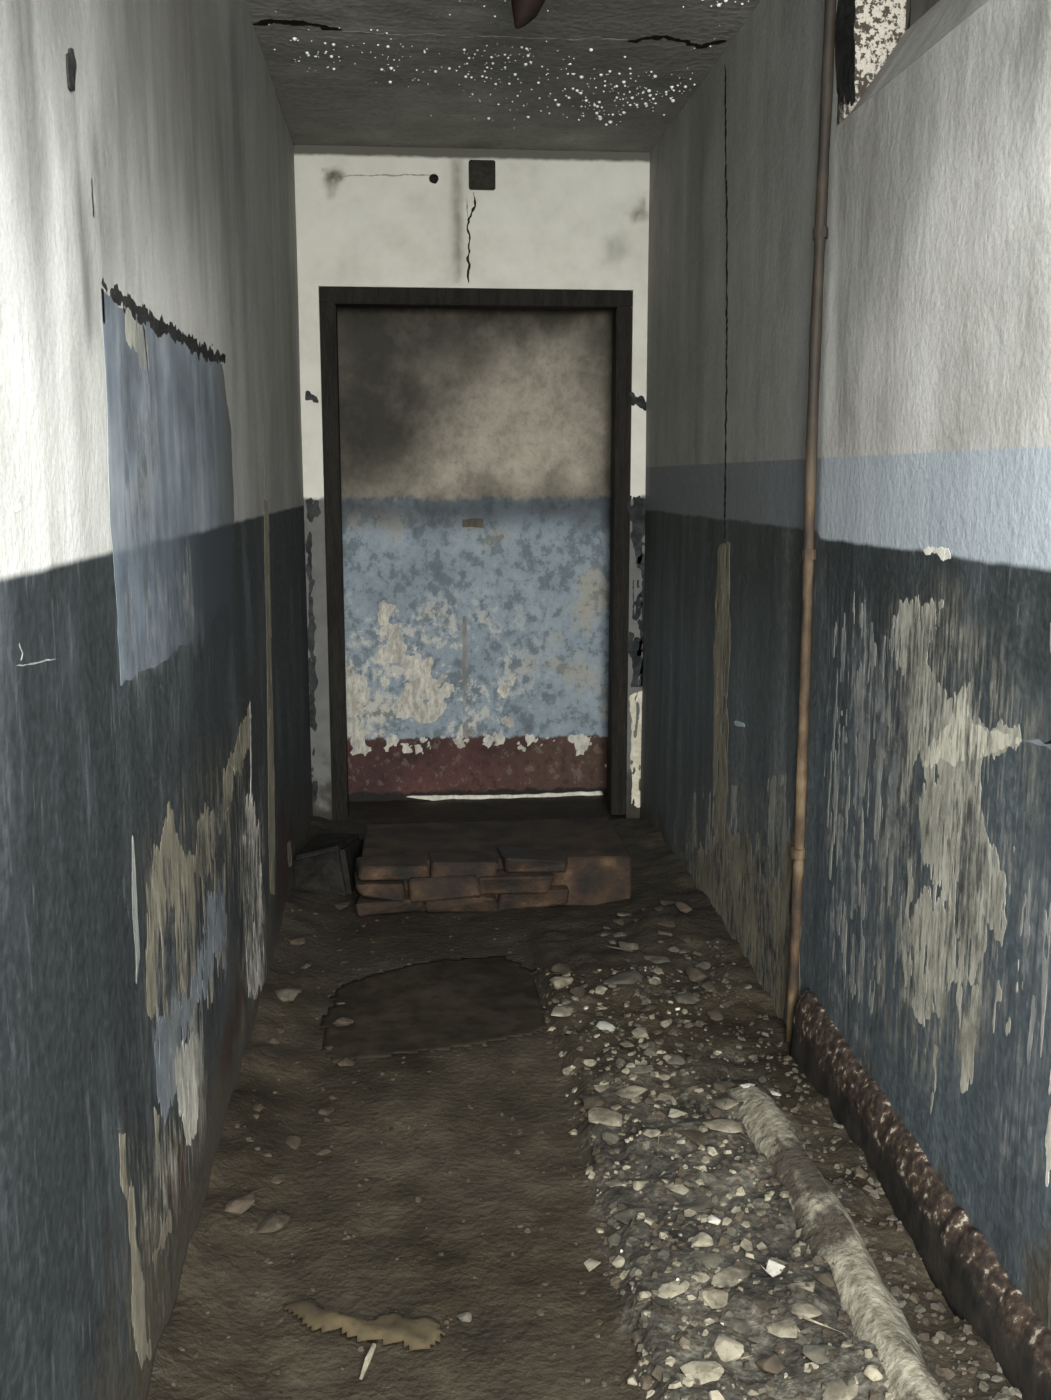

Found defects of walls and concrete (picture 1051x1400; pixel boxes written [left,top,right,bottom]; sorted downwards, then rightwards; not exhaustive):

crack [253,19,342,31]
peeling [125,308,149,370]
crack [466,192,476,284]
crack [628,35,728,539]
peeling [923,546,951,561]
peeling [345,600,592,756]
peeling [119,431,292,1369]
peeling [824,592,1051,1187]